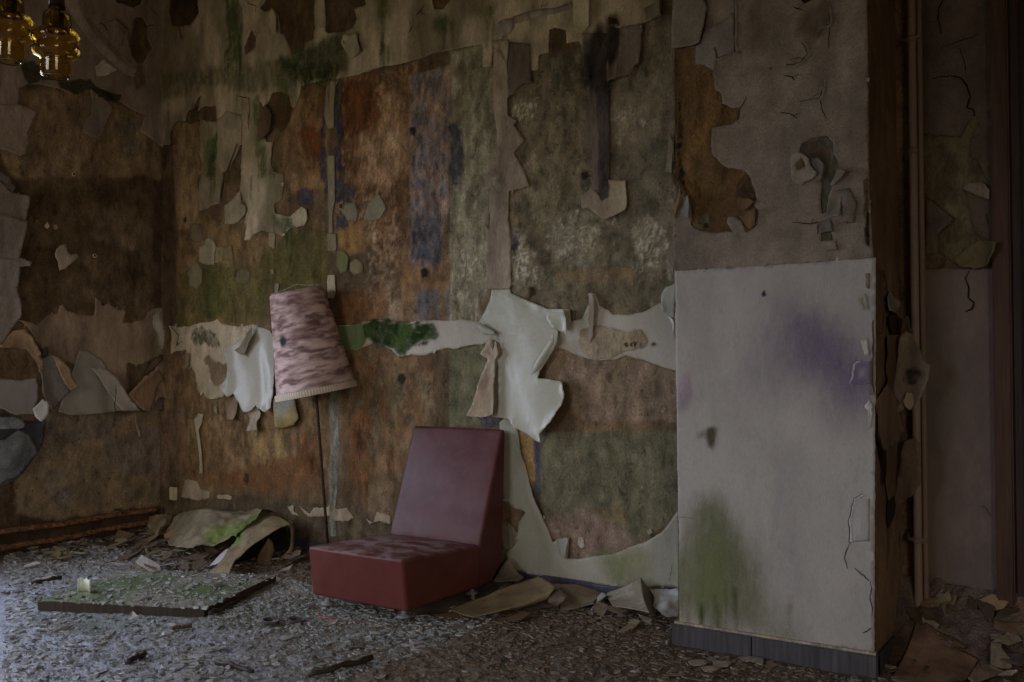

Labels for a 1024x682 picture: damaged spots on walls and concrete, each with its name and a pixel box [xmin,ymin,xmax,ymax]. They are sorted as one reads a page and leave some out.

flaking render [187,106,217,124]
damp [580,15,649,200]
peeling [639,0,874,271]
crack [781,40,827,119]
peeling [908,0,992,270]
crack [933,0,983,116]
peeling [33,399,49,422]
peeling [859,270,911,528]
crack [844,493,873,633]